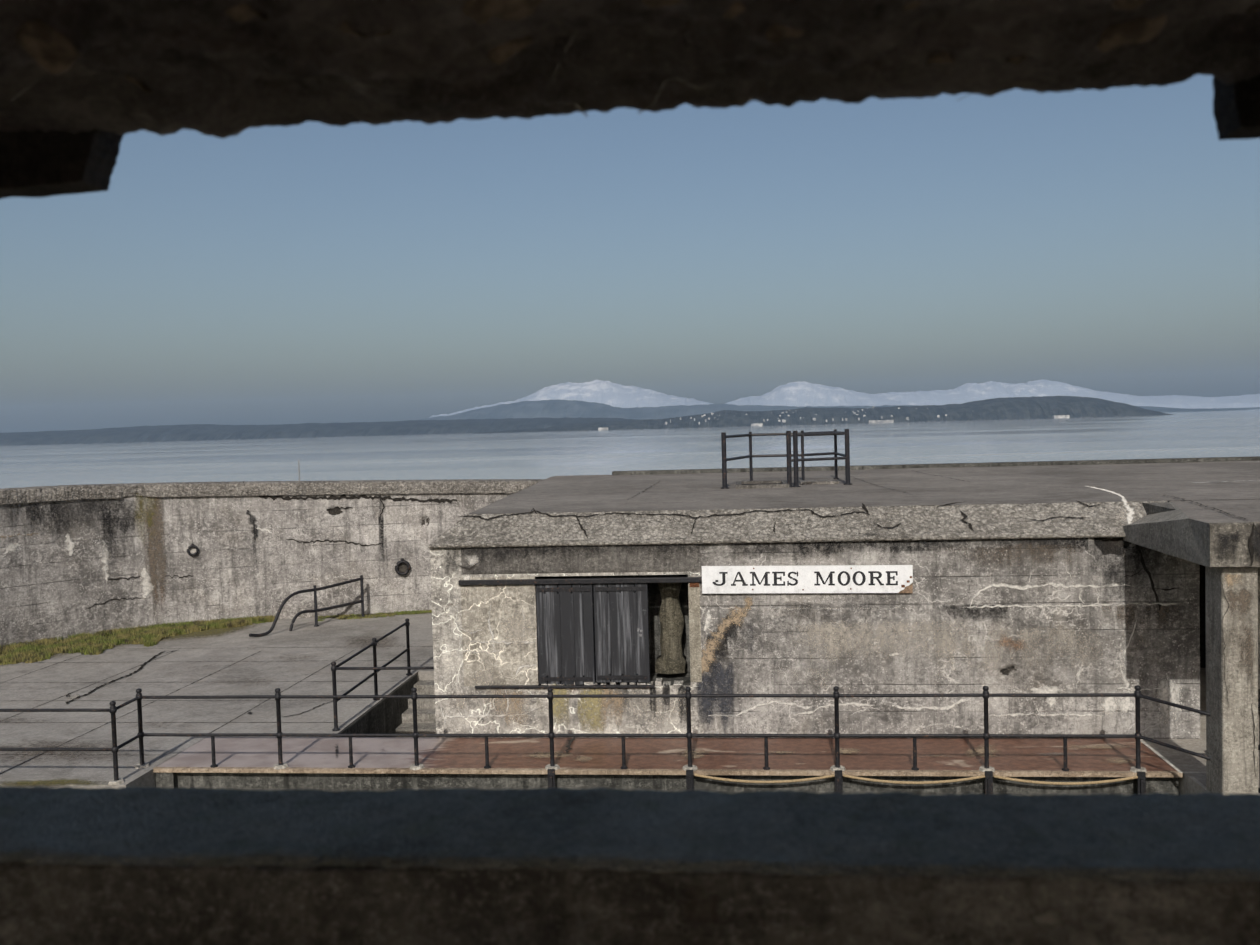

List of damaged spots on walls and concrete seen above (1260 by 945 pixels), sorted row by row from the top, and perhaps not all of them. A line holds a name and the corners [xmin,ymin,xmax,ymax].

water stain [8,496,166,598]
crack [89,575,192,608]
crack [243,470,973,579]
crack [1030,486,1104,521]
crack [1124,544,1178,610]
water stain [650,609,873,729]
water stain [892,698,972,730]